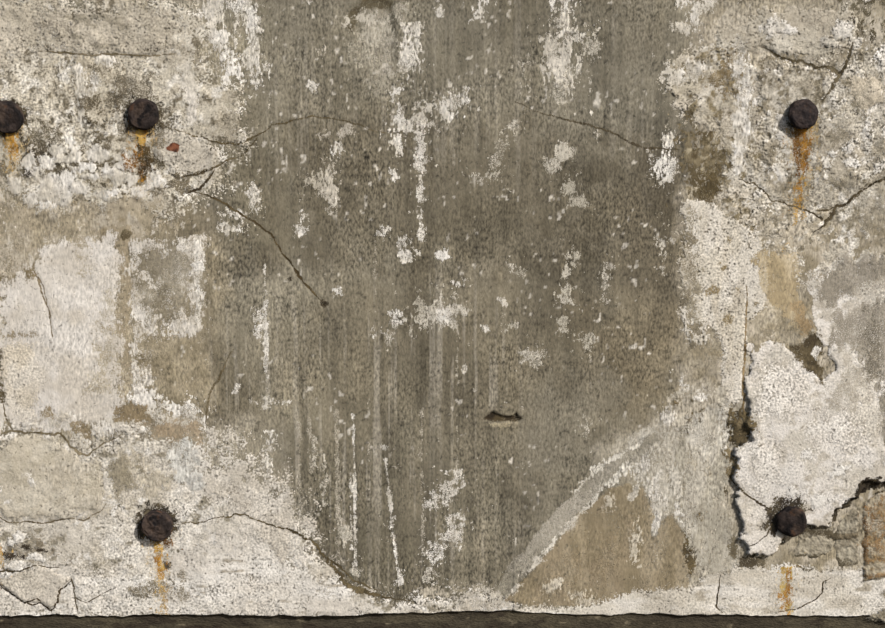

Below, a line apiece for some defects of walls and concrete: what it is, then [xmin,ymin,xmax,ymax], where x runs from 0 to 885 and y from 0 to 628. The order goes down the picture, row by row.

peeling [669,0,717,38]
crack [761,42,853,102]
rust [0,125,31,188]
rust [121,109,170,192]
crack [165,115,385,306]
rust [781,113,829,256]
crack [739,177,885,233]
crack [0,565,111,612]
rust [141,528,183,615]
crack [173,513,411,601]